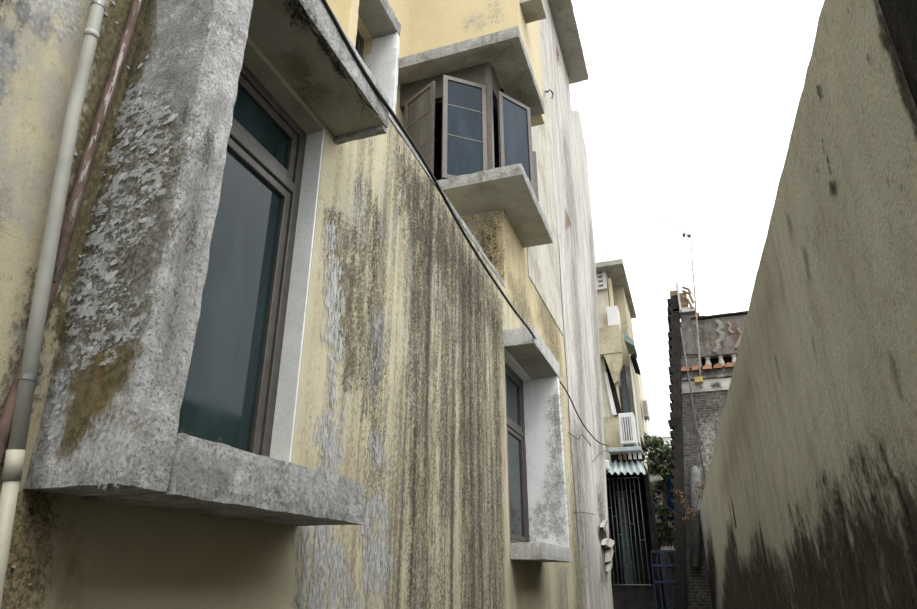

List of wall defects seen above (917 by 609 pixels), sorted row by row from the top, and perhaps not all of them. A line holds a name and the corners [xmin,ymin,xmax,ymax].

leakage [0,266,38,418]
leakage [66,399,146,487]
peeling [48,55,205,444]
leakage [322,177,391,510]
leakage [389,140,563,609]